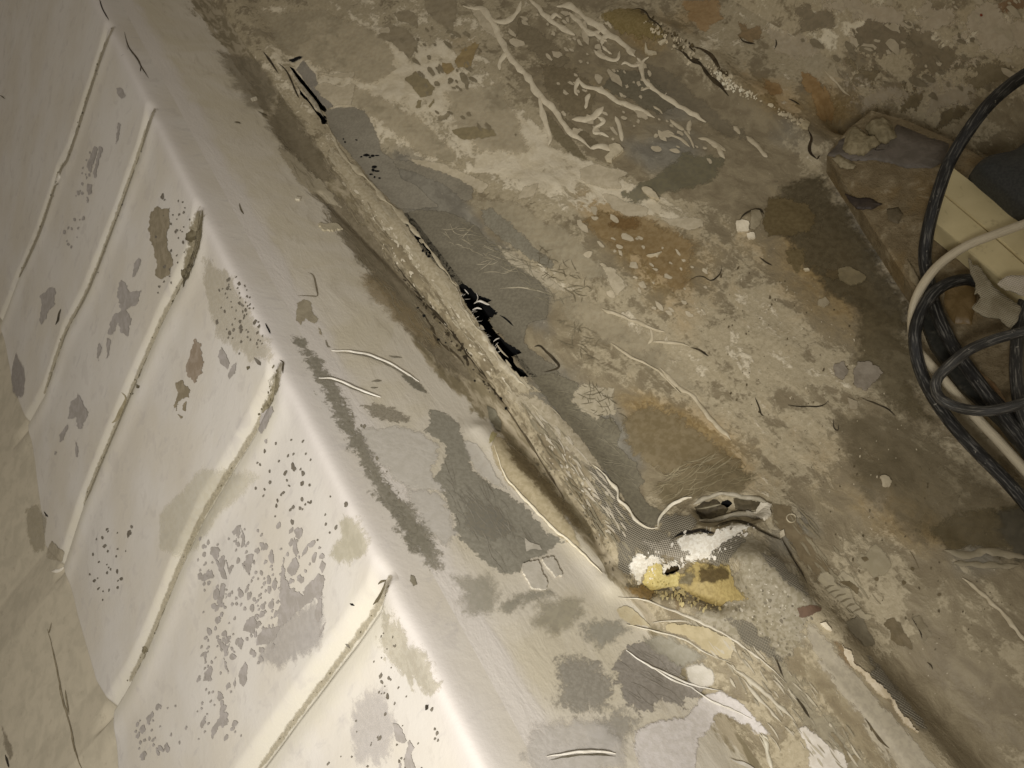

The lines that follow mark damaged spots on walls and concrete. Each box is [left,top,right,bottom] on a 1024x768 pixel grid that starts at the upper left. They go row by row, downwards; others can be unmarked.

crack [264,53,299,97]
crack [630,8,729,96]
peeling [97,258,141,361]
peeling [148,206,173,279]
peeling [296,61,664,527]
damp [582,213,696,291]
damp [762,176,932,422]
peeling [54,394,88,457]
damp [622,405,750,504]
peeling [233,526,264,576]
peeling [746,502,772,521]
peeling [203,539,325,689]